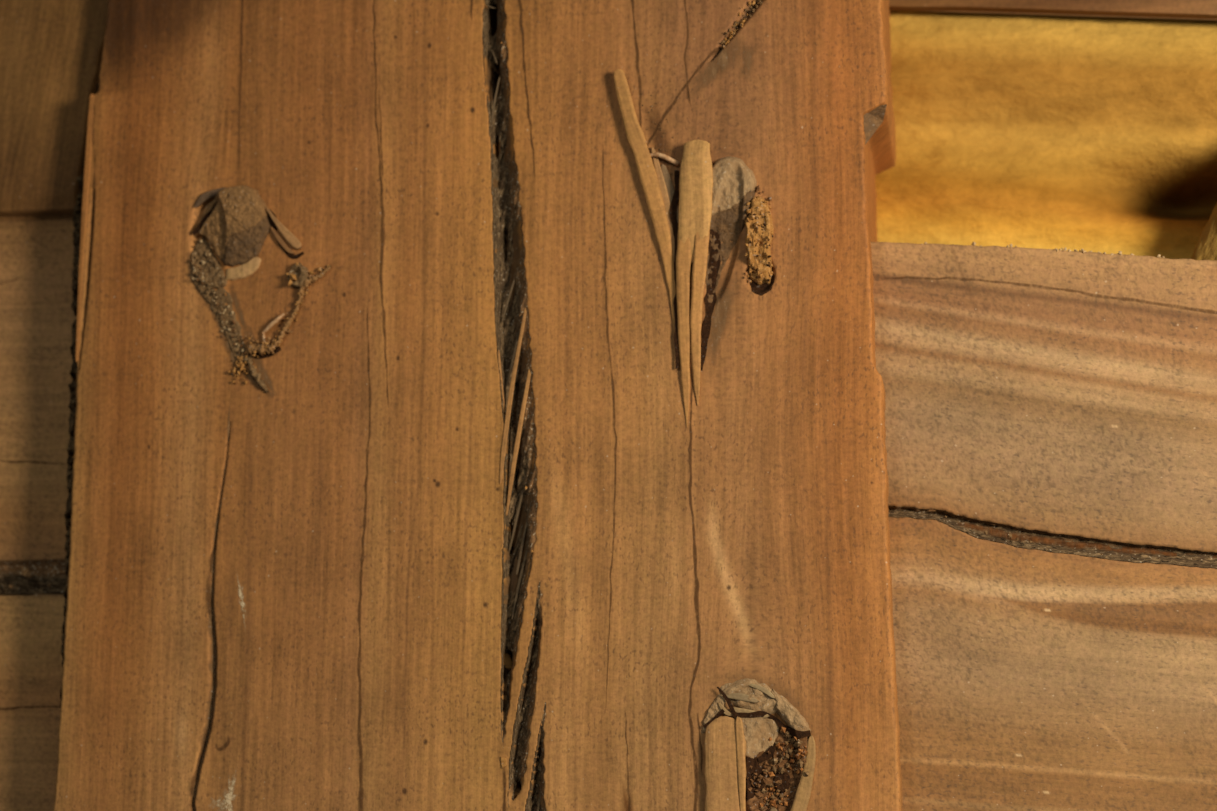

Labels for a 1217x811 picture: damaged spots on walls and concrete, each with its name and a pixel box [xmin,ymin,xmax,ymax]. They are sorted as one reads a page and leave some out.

crack [190,409,230,811]
peeling [266,207,304,259]
crack [358,13,388,810]
crack [471,0,546,811]
crack [631,0,762,143]
crack [888,506,1217,568]